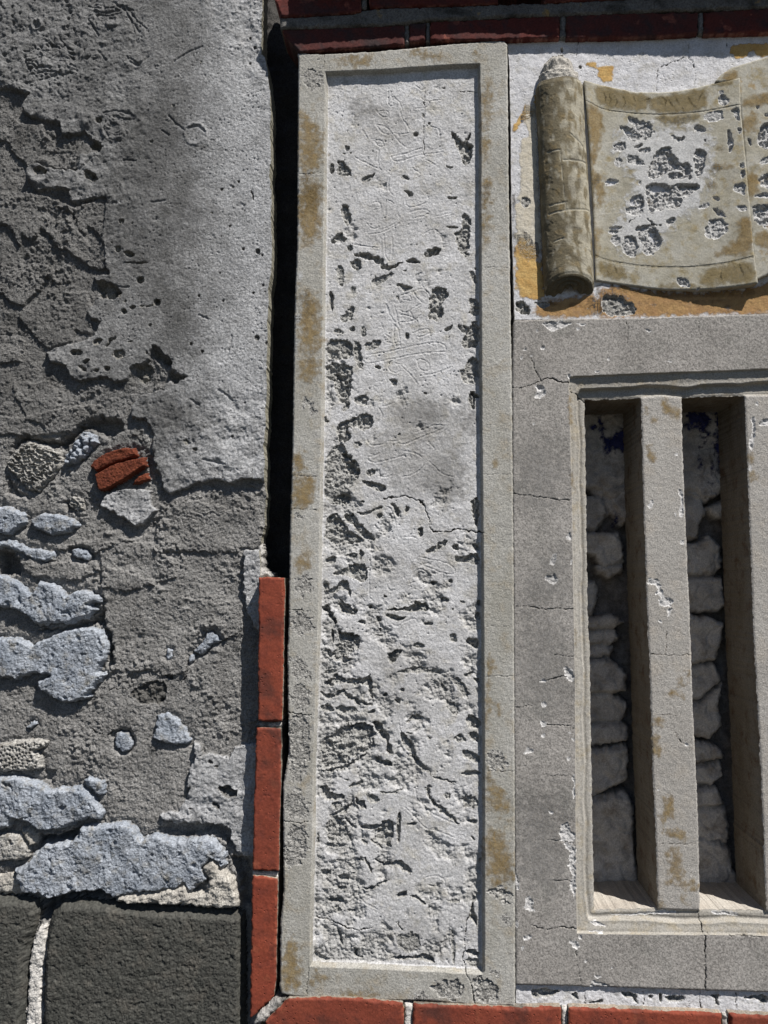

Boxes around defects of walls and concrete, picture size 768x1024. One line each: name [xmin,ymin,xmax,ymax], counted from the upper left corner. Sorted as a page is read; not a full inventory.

peeling [730,43,768,59]
leakage [297,111,322,241]
peeling [513,95,542,260]
peeling [578,62,768,279]
spalling [515,300,550,315]
leakage [294,293,322,381]
crack [384,495,483,533]
spalling [129,674,173,705]
spalling [212,785,238,809]
leakage [663,798,674,821]
leakage [484,830,514,884]
spalling [559,822,578,897]